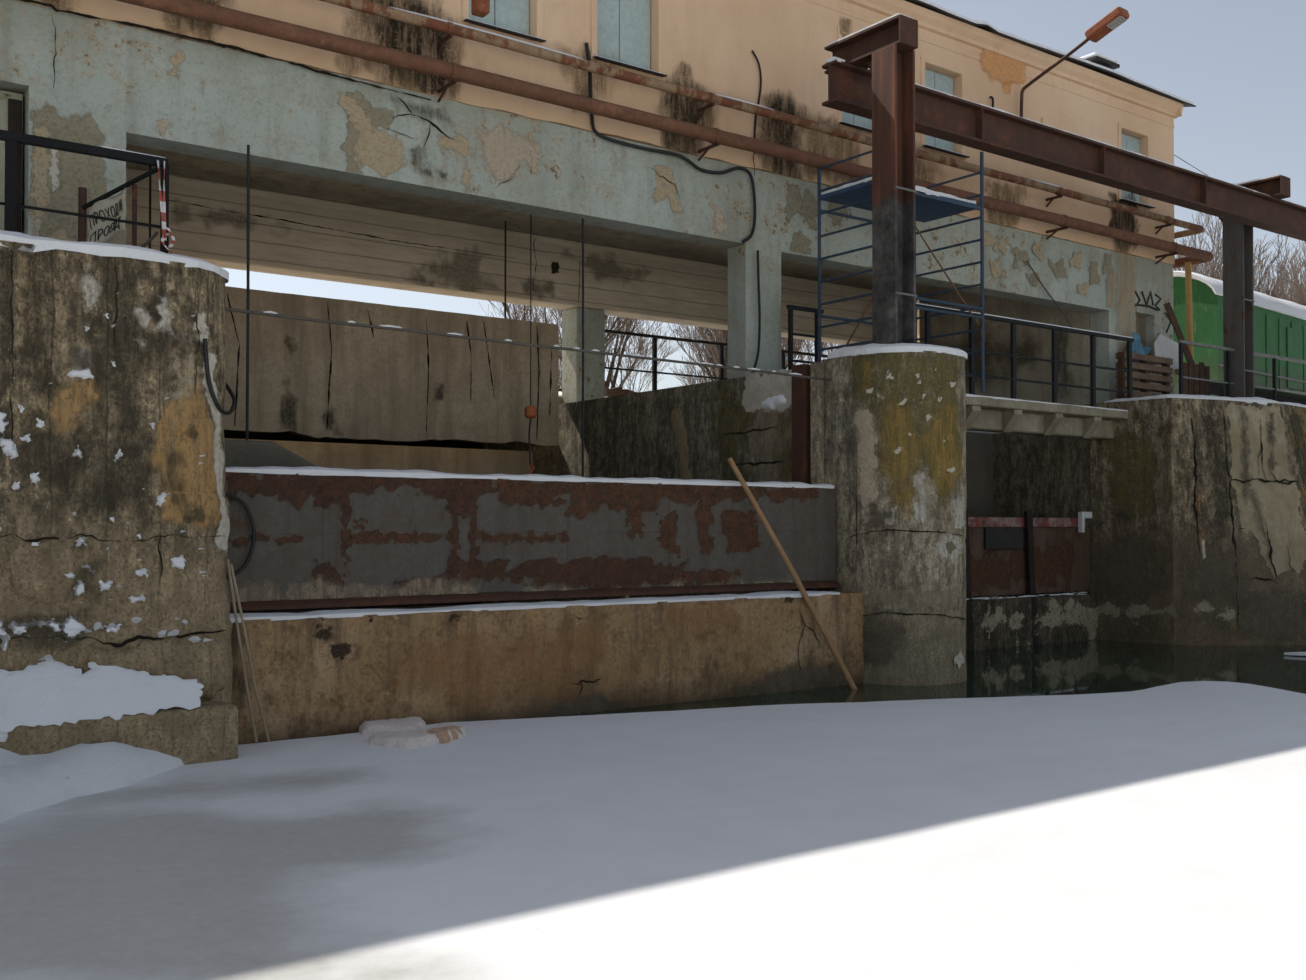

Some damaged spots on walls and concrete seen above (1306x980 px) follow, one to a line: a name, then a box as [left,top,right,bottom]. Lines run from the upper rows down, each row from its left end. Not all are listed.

leakage [362,0,460,62]
peeling [27,103,110,242]
peeling [337,91,413,178]
peeling [652,165,683,213]
leakage [661,64,714,155]
leakage [761,92,858,182]
peeling [104,230,125,245]
leakage [2,266,221,529]
crack [0,533,221,591]
corrosion [226,472,819,599]
crack [1191,412,1306,627]
crack [0,609,226,648]